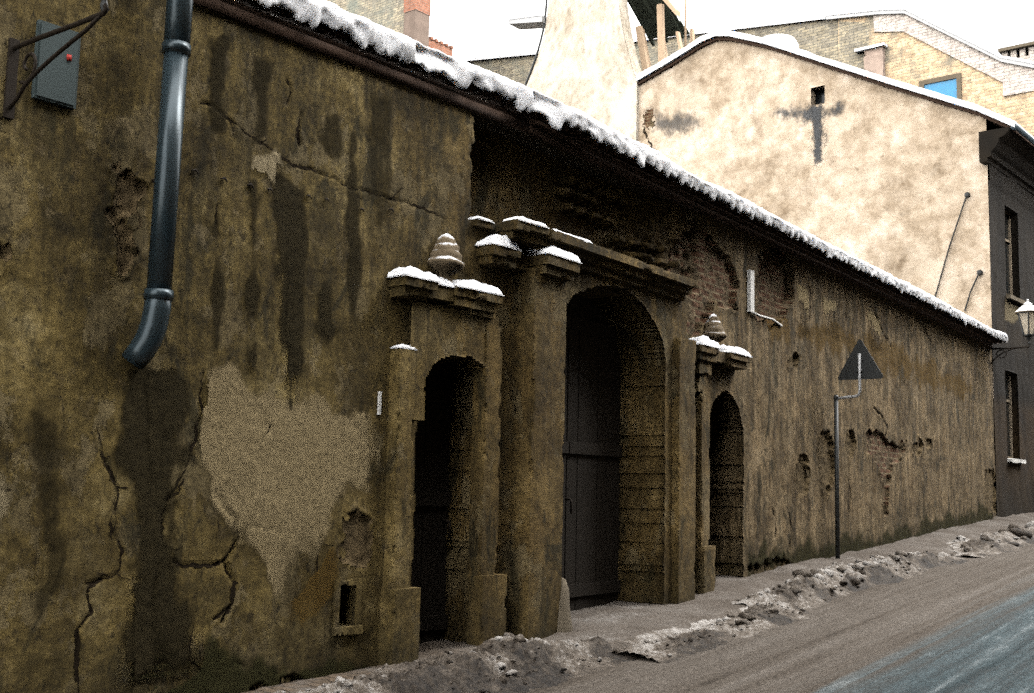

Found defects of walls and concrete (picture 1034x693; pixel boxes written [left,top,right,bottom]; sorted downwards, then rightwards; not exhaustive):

spalling [0,222,12,276]
spalling [105,161,147,276]
crack [201,77,445,219]
crack [74,426,129,693]
crack [156,370,264,670]
spalling [793,428,933,517]